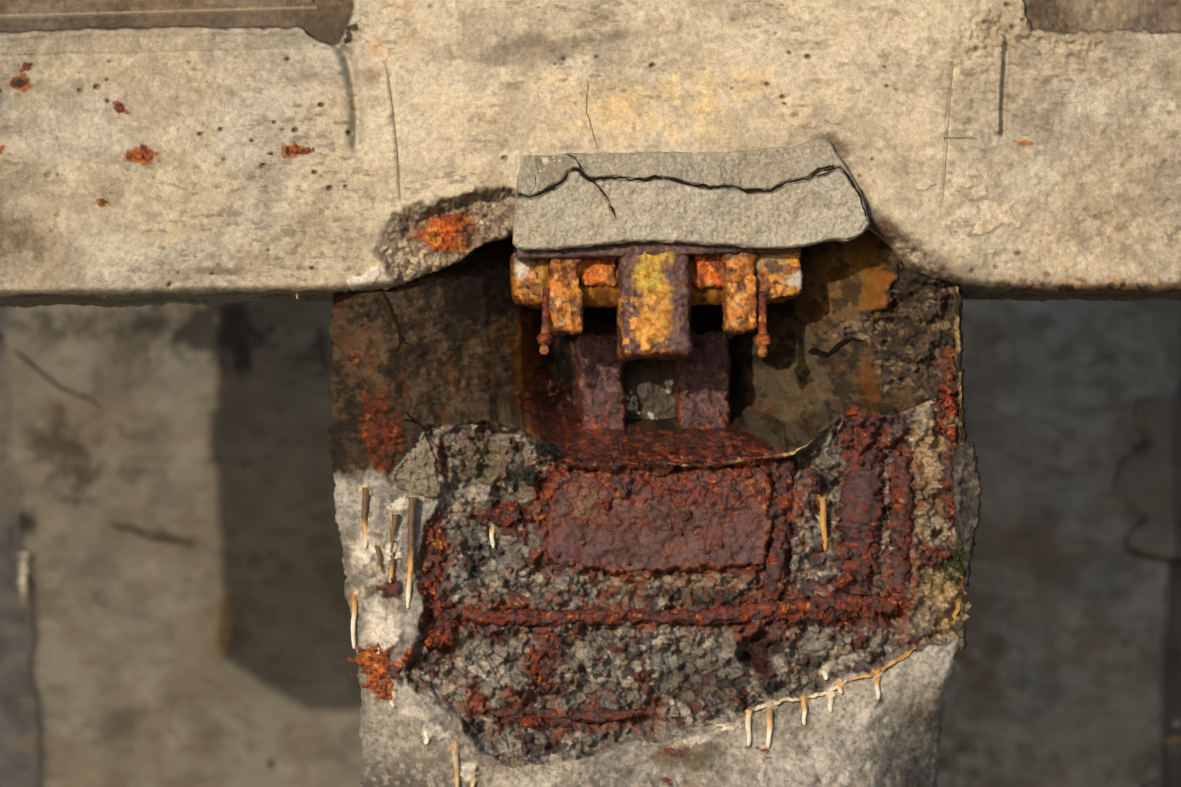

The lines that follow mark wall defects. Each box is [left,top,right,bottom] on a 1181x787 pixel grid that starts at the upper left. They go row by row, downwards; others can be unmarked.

rust [0,62,32,92]
rust [113,101,129,114]
rust [124,144,158,165]
rust [267,141,314,158]
crack [518,79,867,220]
spalling [347,188,515,291]
rust [415,213,479,252]
rust [512,369,785,473]
rust [935,370,964,519]
spalling [389,196,982,768]
rust [375,578,401,599]
rust [347,643,420,701]